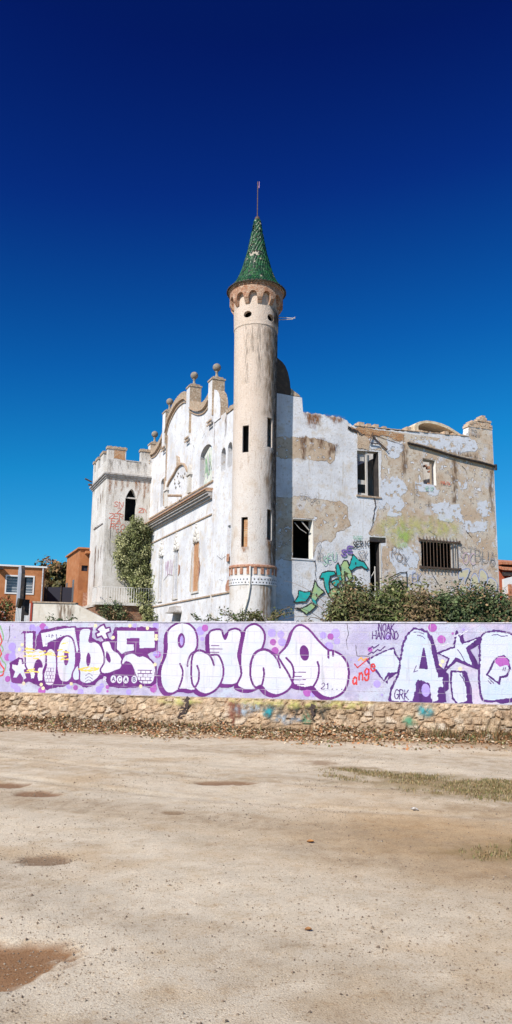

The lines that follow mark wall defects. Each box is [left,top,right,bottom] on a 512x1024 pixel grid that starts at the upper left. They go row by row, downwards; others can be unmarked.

peeling [276,436,335,464]
peeling [275,496,351,561]
peeling [348,426,499,603]